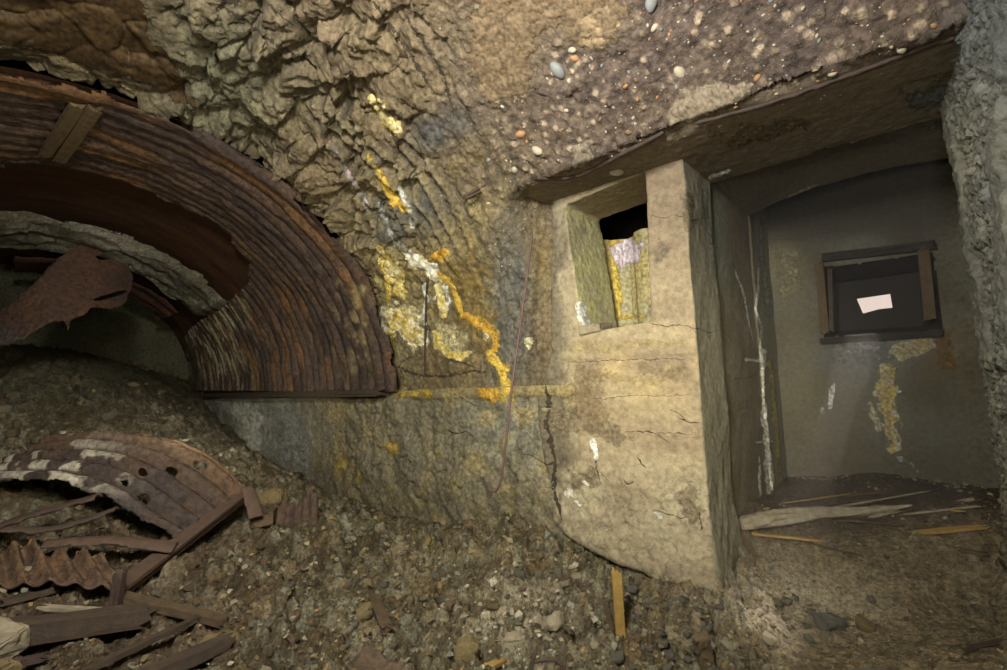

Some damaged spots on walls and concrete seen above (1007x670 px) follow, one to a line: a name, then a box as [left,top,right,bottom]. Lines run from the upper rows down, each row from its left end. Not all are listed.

leakage [367,94,404,138]
leakage [332,146,511,402]
corrosion [0,493,179,554]
crack [512,378,562,521]
crack [592,450,646,486]
crack [586,394,697,446]
leakage [734,220,807,497]
leakage [827,337,937,473]